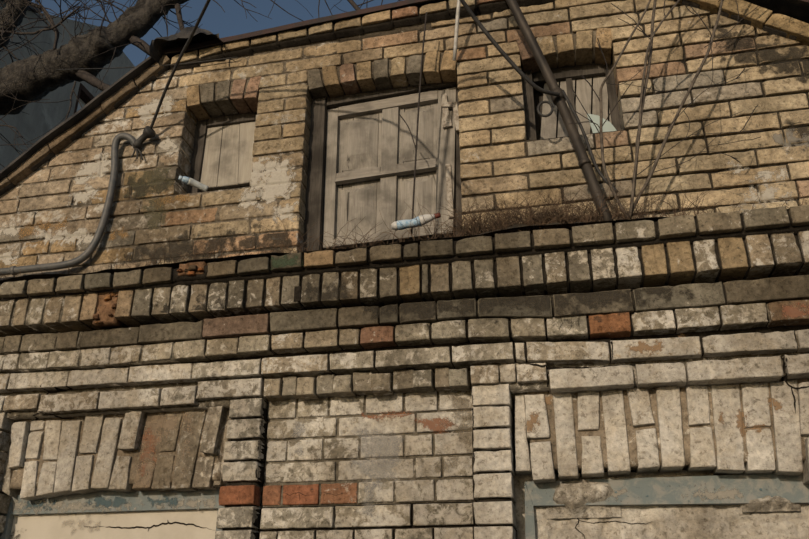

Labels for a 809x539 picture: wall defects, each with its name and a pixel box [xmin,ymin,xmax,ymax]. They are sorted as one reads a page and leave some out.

spalling [92,292,123,329]
crack [780,356,809,414]
crack [84,520,212,531]
crack [575,518,650,538]